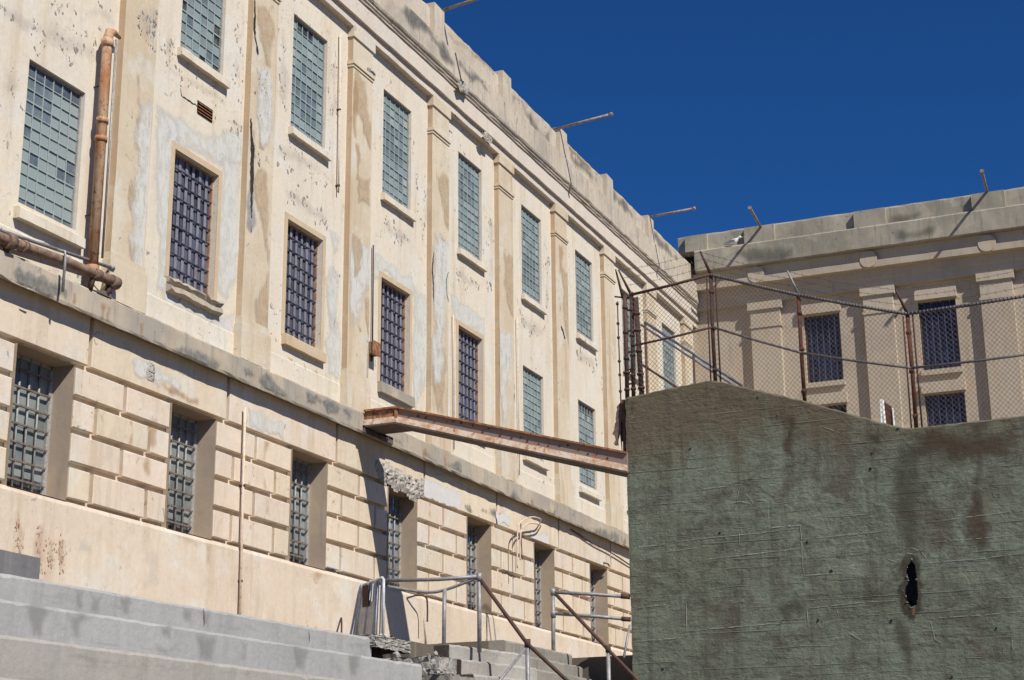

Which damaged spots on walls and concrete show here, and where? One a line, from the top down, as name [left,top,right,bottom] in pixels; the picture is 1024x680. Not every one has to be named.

crack [252,2,260,55]
crack [248,119,256,232]
peeling [129,102,255,333]
spalling [375,450,424,502]
rust [13,520,66,580]